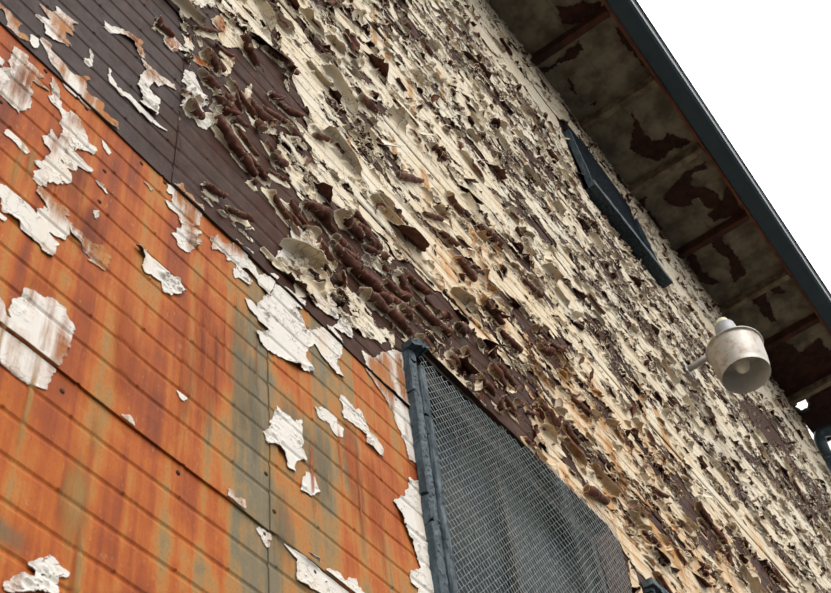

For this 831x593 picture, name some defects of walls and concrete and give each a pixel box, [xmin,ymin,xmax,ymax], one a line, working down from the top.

peeling [103,20,176,131]
peeling [0,4,119,271]
peeling [0,287,76,390]
rust [30,279,51,300]
peeling [136,244,186,296]
peeling [151,0,793,593]
rust [338,432,385,545]
peeling [692,338,831,593]
peeling [2,555,70,593]